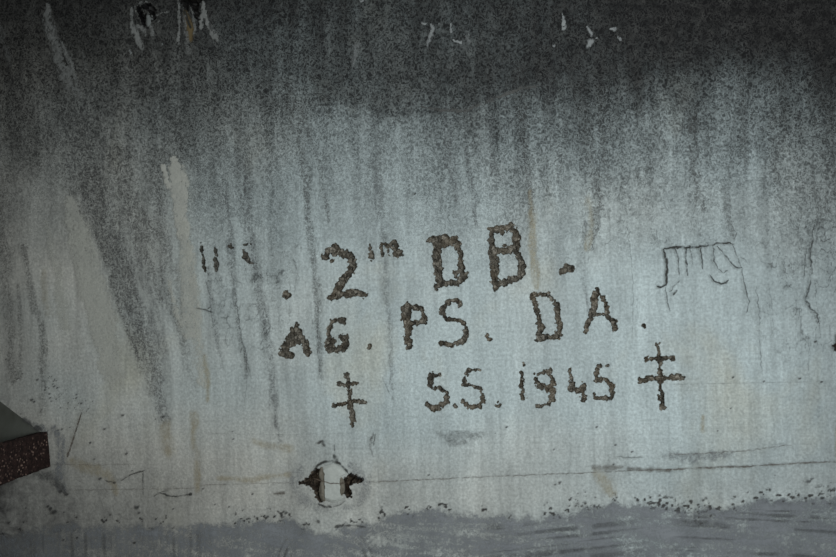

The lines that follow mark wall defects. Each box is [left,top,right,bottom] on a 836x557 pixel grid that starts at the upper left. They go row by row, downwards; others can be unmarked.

spalling [129,0,218,55]
spalling [298,440,364,508]